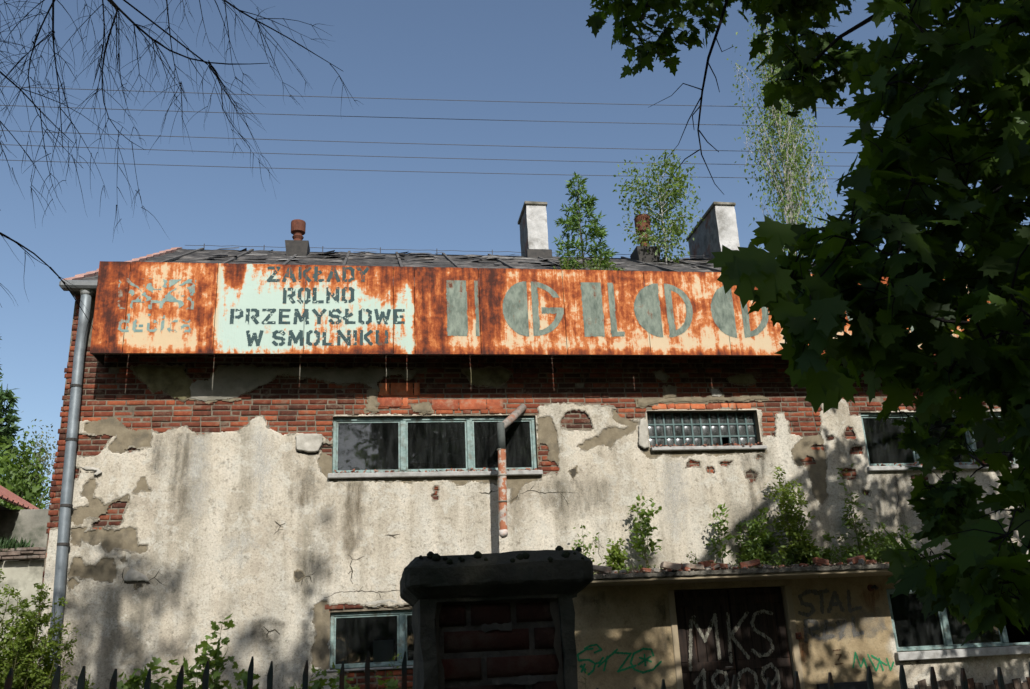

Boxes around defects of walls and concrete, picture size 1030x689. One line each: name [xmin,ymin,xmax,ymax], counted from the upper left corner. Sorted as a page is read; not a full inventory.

flaking render [899,388,923,411]
flaking render [46,347,888,592]
spalling [0,547,46,561]